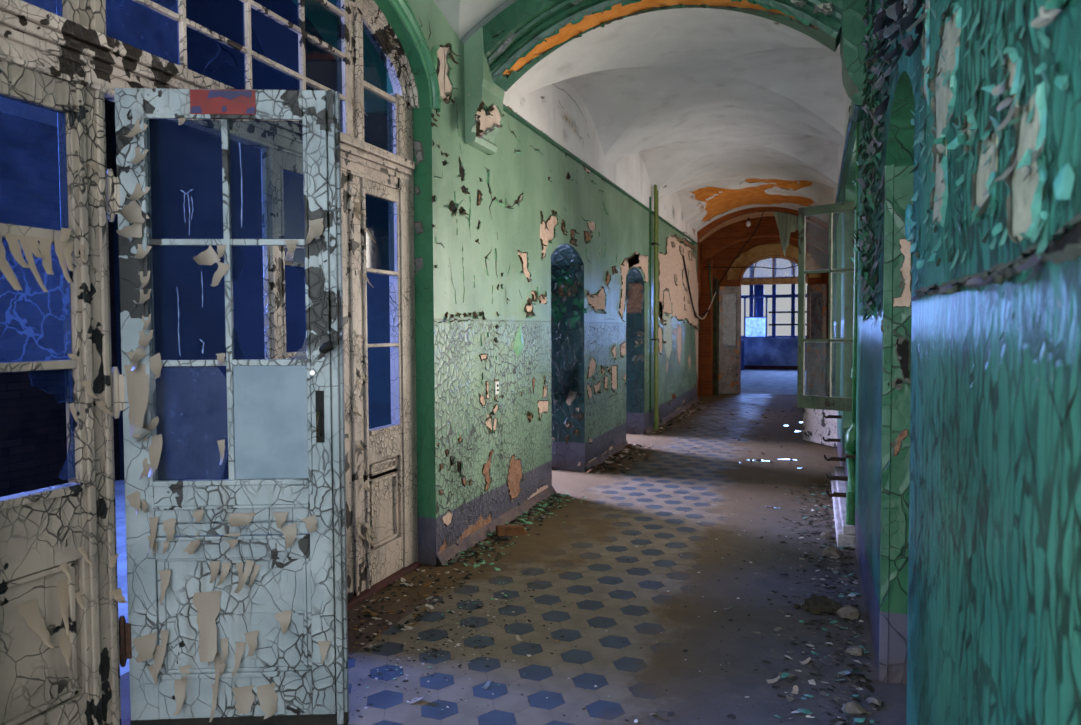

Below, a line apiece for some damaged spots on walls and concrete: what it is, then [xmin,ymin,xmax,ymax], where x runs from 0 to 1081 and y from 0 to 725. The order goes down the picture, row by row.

peeling [431,43,460,127]
peeling [474,101,527,138]
peeling [413,139,483,244]
peeling [518,210,649,328]
peeling [674,234,697,256]
peeling [445,311,501,343]
peeling [658,273,685,355]
peeling [521,330,644,445]
peeling [888,337,911,390]
flaking render [437,435,494,491]
flaking render [506,454,550,506]
flaking render [438,509,492,554]